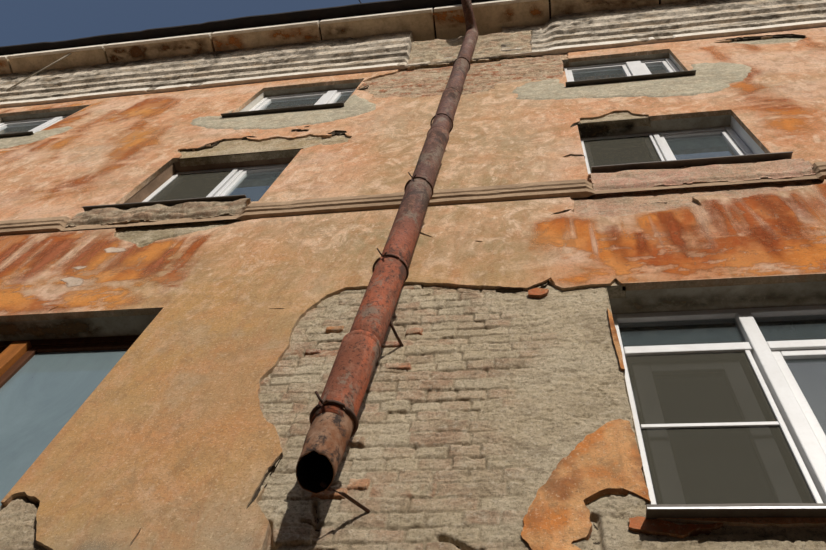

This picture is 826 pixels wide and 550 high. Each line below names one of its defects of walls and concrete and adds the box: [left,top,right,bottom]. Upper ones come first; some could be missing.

spalling [359,65,453,98]
spalling [461,53,570,95]
spalling [104,220,242,253]
rust [536,183,826,283]
rust [0,230,208,314]
spalling [258,281,826,550]
spalling [0,497,46,550]